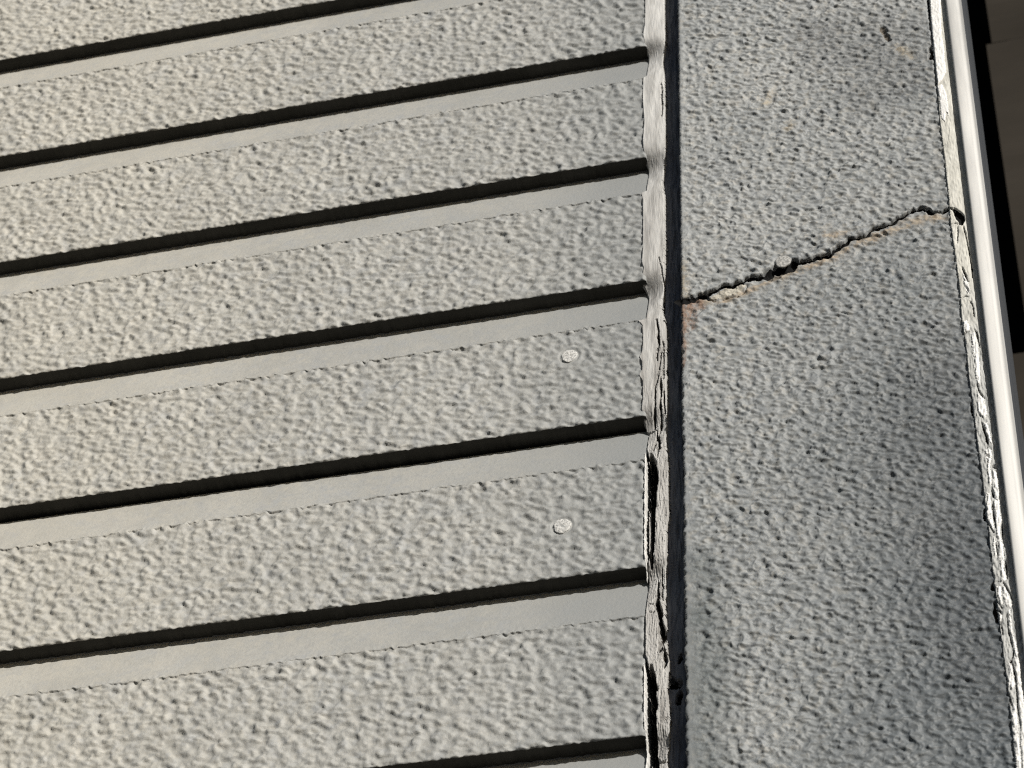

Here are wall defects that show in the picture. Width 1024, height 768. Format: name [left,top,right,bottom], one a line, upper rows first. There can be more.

crack [662,209,980,347]
crack [654,324,666,453]
crack [656,576,667,669]